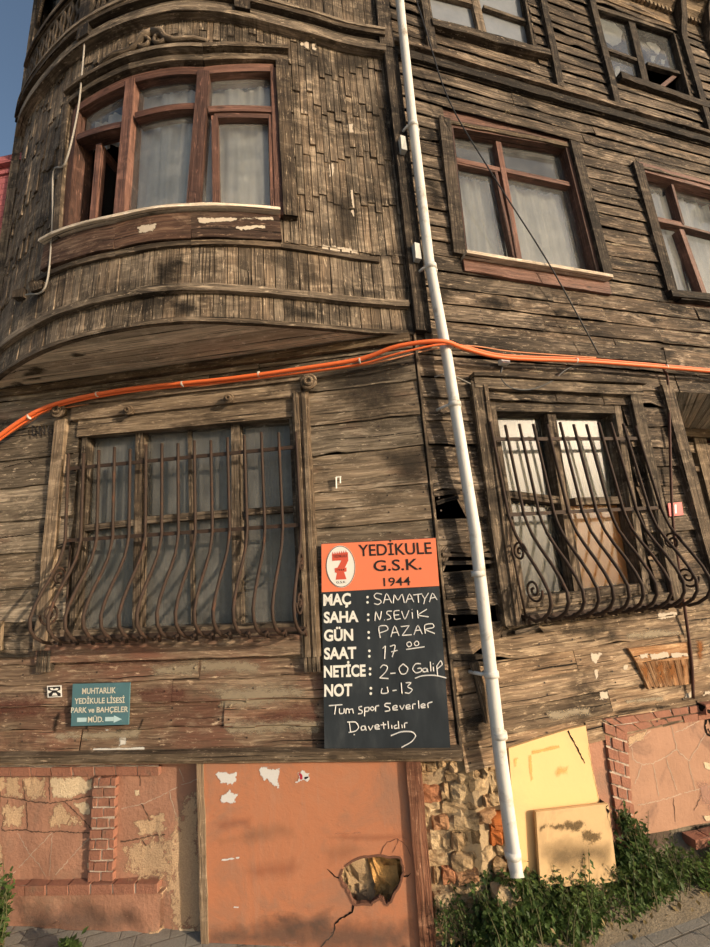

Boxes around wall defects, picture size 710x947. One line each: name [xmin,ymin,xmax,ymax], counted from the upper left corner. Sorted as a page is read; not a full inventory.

peeling [137,223,157,233]
peeling [197,217,273,230]
peeling [640,652,688,660]
crack [696,701,710,736]
crack [567,723,611,827]
peeling [0,776,92,828]
spalling [122,791,200,931]
spalling [339,854,405,907]
crack [321,905,354,947]